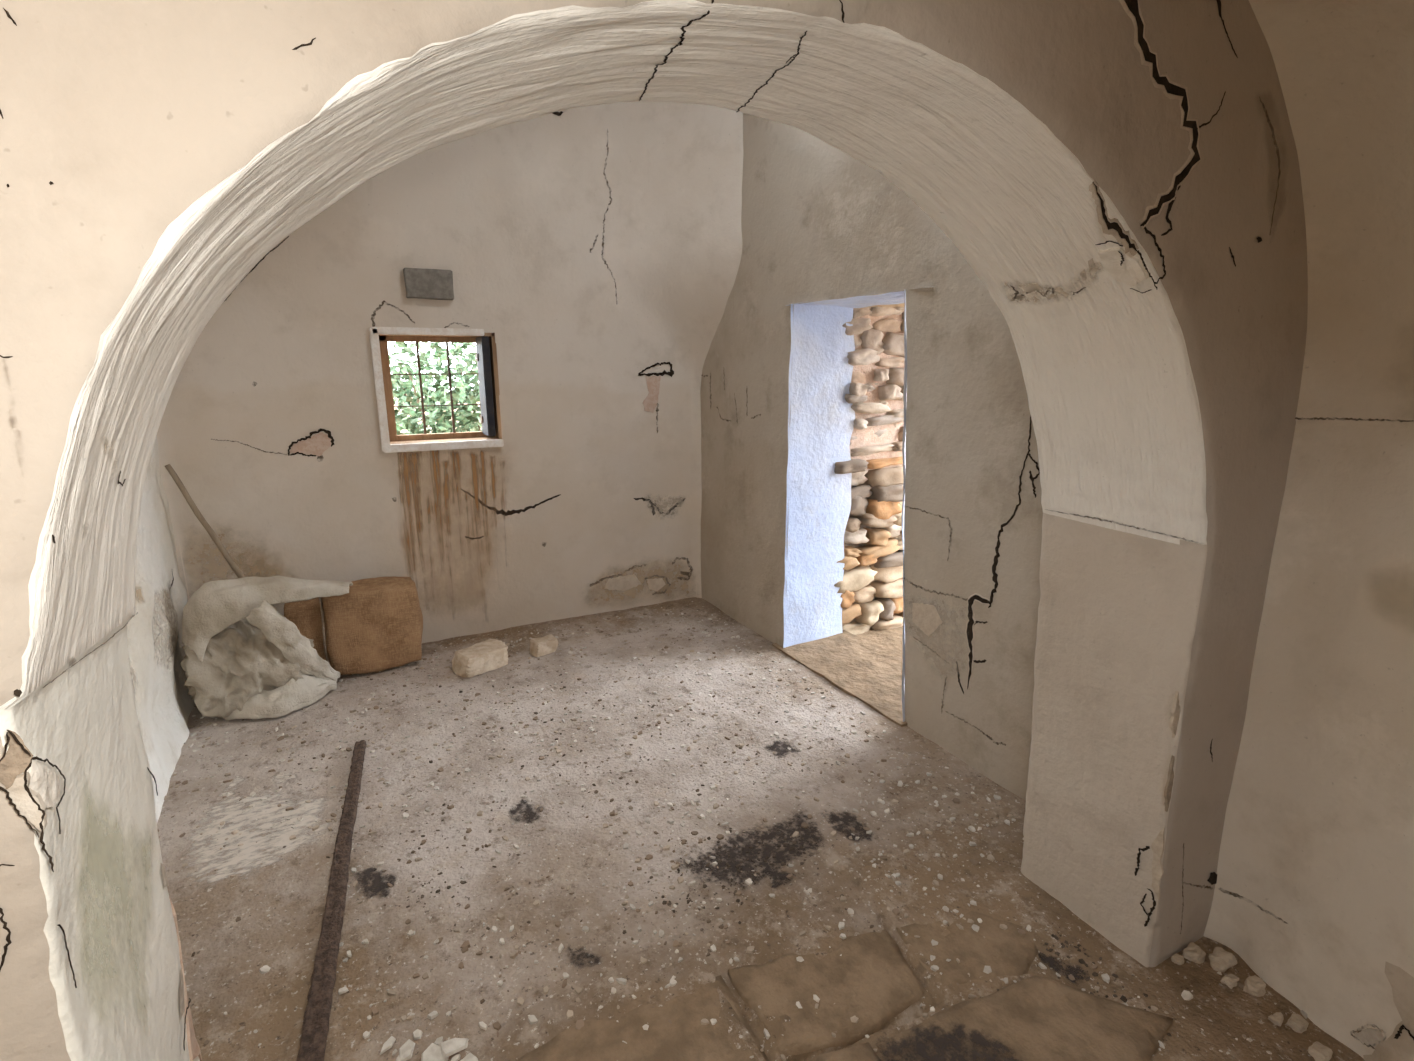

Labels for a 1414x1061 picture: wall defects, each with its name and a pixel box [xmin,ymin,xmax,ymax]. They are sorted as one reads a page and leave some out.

crack [639,0,714,101]
crack [736,31,807,113]
crack [1216,0,1238,58]
crack [1089,0,1226,289]
crack [590,129,617,304]
peeling [1010,285,1055,300]
peeling [1073,247,1152,295]
peeling [211,428,334,459]
crack [461,489,561,540]
crack [904,415,1193,694]
spalling [0,730,66,872]
crack [0,908,12,971]